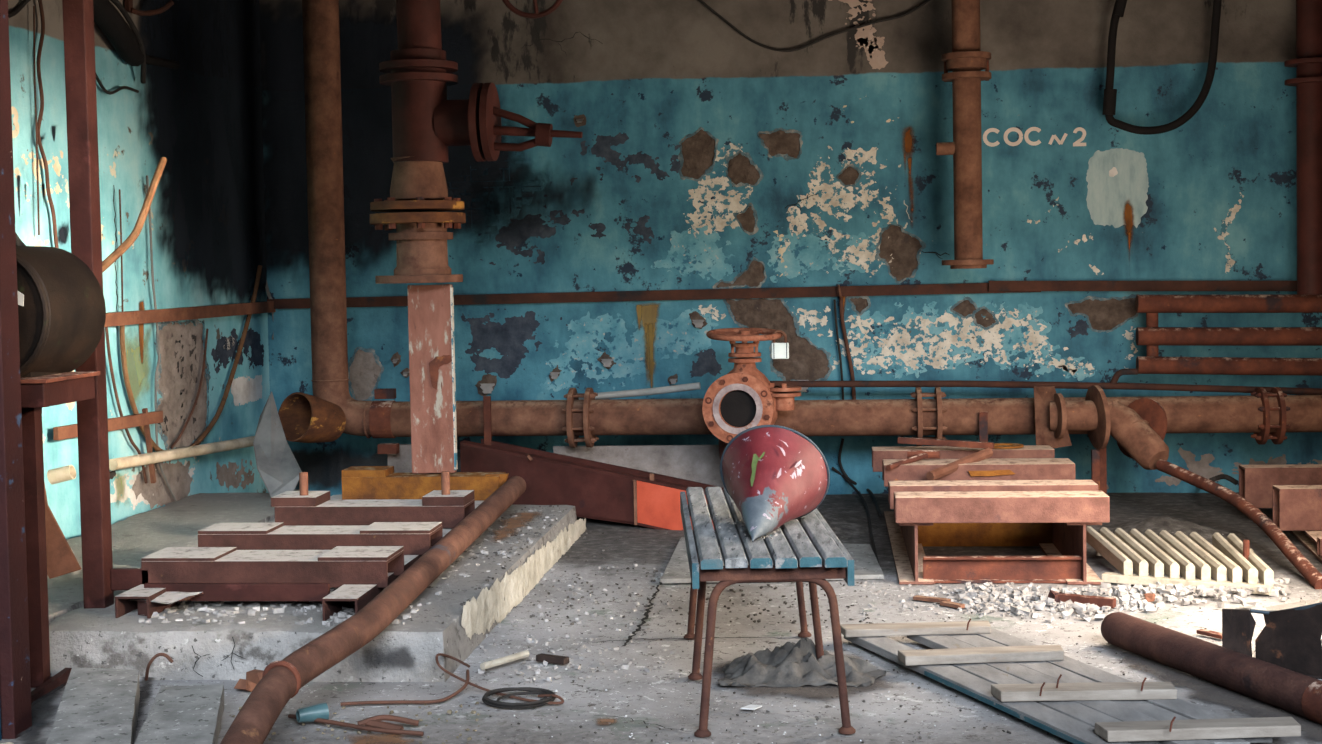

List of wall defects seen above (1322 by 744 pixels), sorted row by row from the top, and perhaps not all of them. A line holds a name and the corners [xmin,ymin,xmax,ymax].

peeling [461,114,1139,396]
spalling [109,319,274,510]